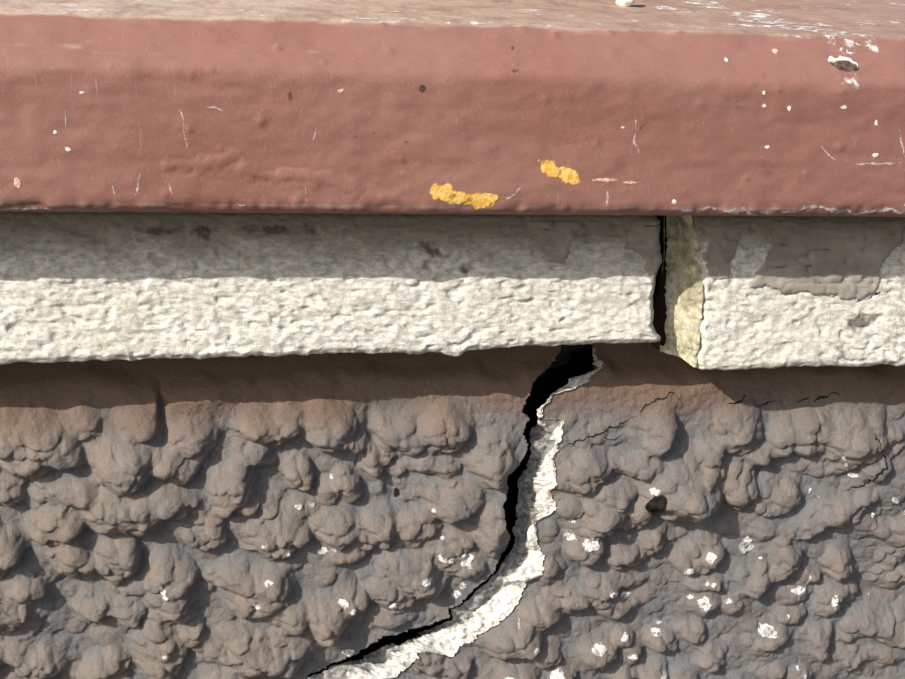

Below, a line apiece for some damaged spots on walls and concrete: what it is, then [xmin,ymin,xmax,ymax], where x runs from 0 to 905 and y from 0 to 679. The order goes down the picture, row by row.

peeling [527,220,581,265]
peeling [624,219,662,284]
crack [650,215,703,367]
peeling [672,199,905,300]
crack [306,345,675,679]